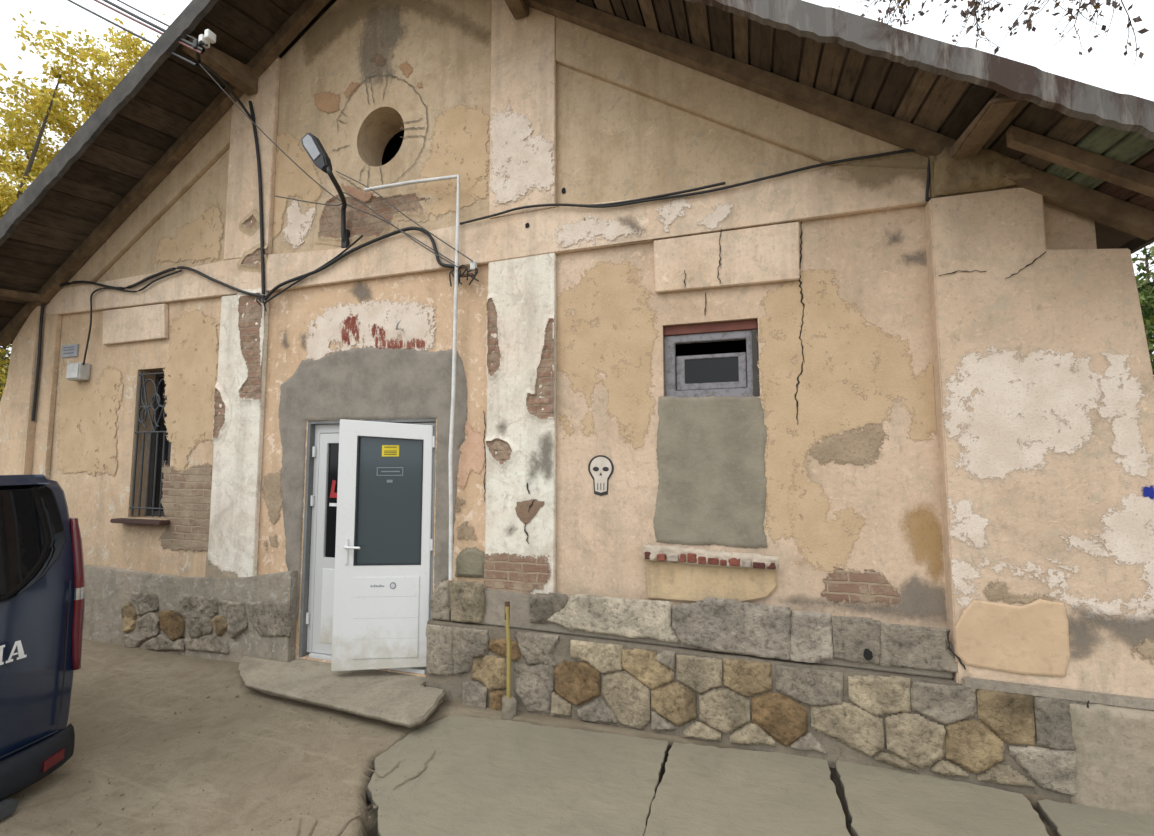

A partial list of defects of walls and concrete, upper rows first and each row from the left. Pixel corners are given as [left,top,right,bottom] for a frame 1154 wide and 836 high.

peeling [237,104,555,272]
peeling [305,299,438,360]
flaking render [486,291,508,384]
crack [795,222,805,425]
peeling [160,287,266,553]
flaking render [262,470,283,550]
peeling [455,422,534,541]
flaking render [509,499,544,532]
peeling [757,268,1154,621]
flaking render [484,552,551,594]
flaking render [1131,638,1154,665]